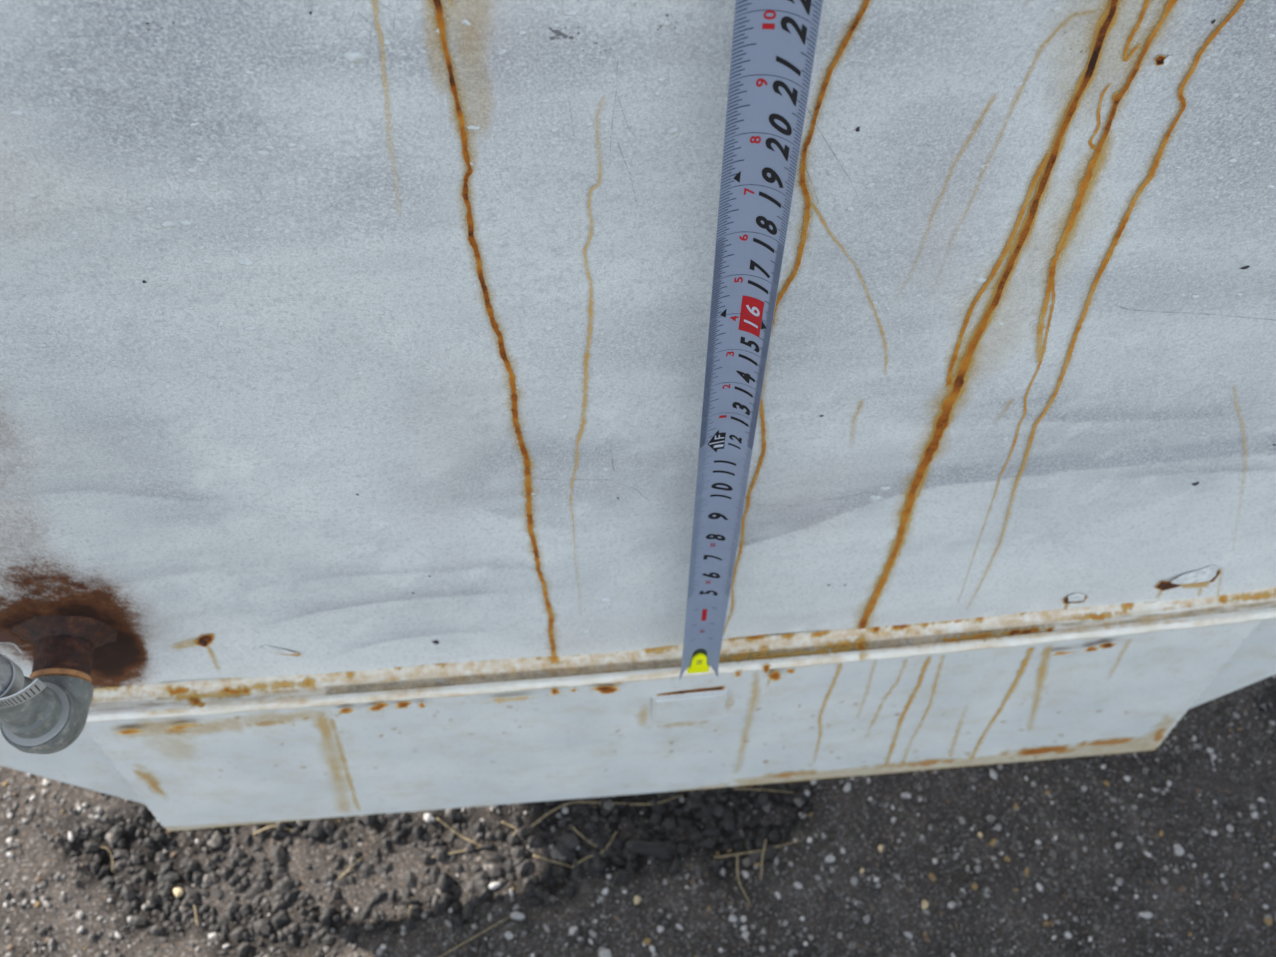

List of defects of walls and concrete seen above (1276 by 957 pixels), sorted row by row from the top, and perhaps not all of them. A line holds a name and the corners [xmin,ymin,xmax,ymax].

rust [429,0,561,664]
rust [570,164,601,516]
rust [720,0,1244,768]
peeling [1155,565,1221,594]
rust [1219,590,1276,604]
rust [0,558,148,690]
rust [645,645,674,654]
rust [167,678,315,707]
rust [369,702,425,711]
rust [551,683,620,695]